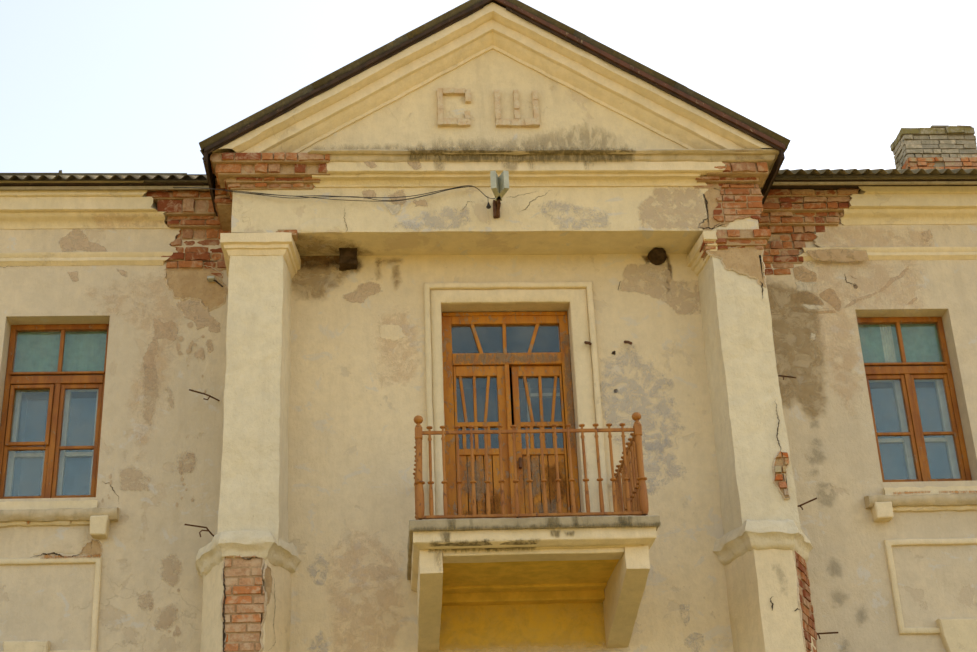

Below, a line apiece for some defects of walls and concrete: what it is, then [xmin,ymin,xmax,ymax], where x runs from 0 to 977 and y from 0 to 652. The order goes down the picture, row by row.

damp [409,148,633,162]
spalling [143,152,330,421]
spalling [693,162,909,314]
spalling [772,451,790,500]
spalling [79,539,103,557]
spalling [220,555,273,652]
spalling [793,550,817,652]